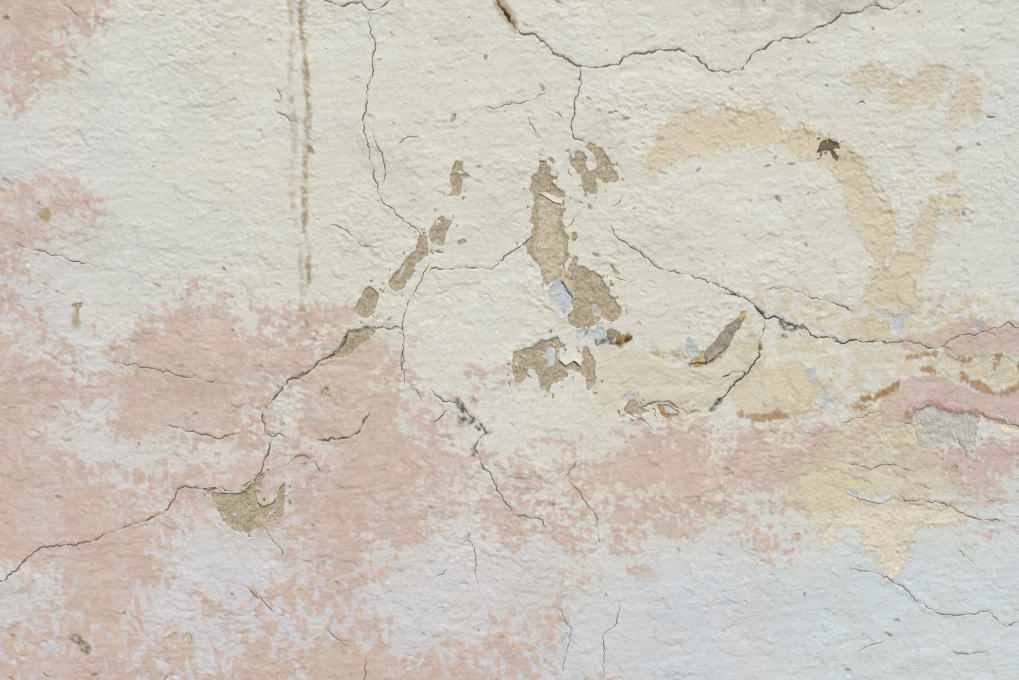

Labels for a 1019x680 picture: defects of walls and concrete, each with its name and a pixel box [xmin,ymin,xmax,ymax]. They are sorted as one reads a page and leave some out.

crack [325,0,420,233]
peeling [443,161,470,200]
crack [487,0,890,141]
crack [0,237,545,582]
peeling [330,215,457,359]
peeling [507,138,627,398]
peeling [618,391,683,421]
peeling [685,311,747,363]
crack [611,199,1018,425]
spalling [203,469,291,537]
crack [849,463,1000,521]
crack [854,568,1017,626]